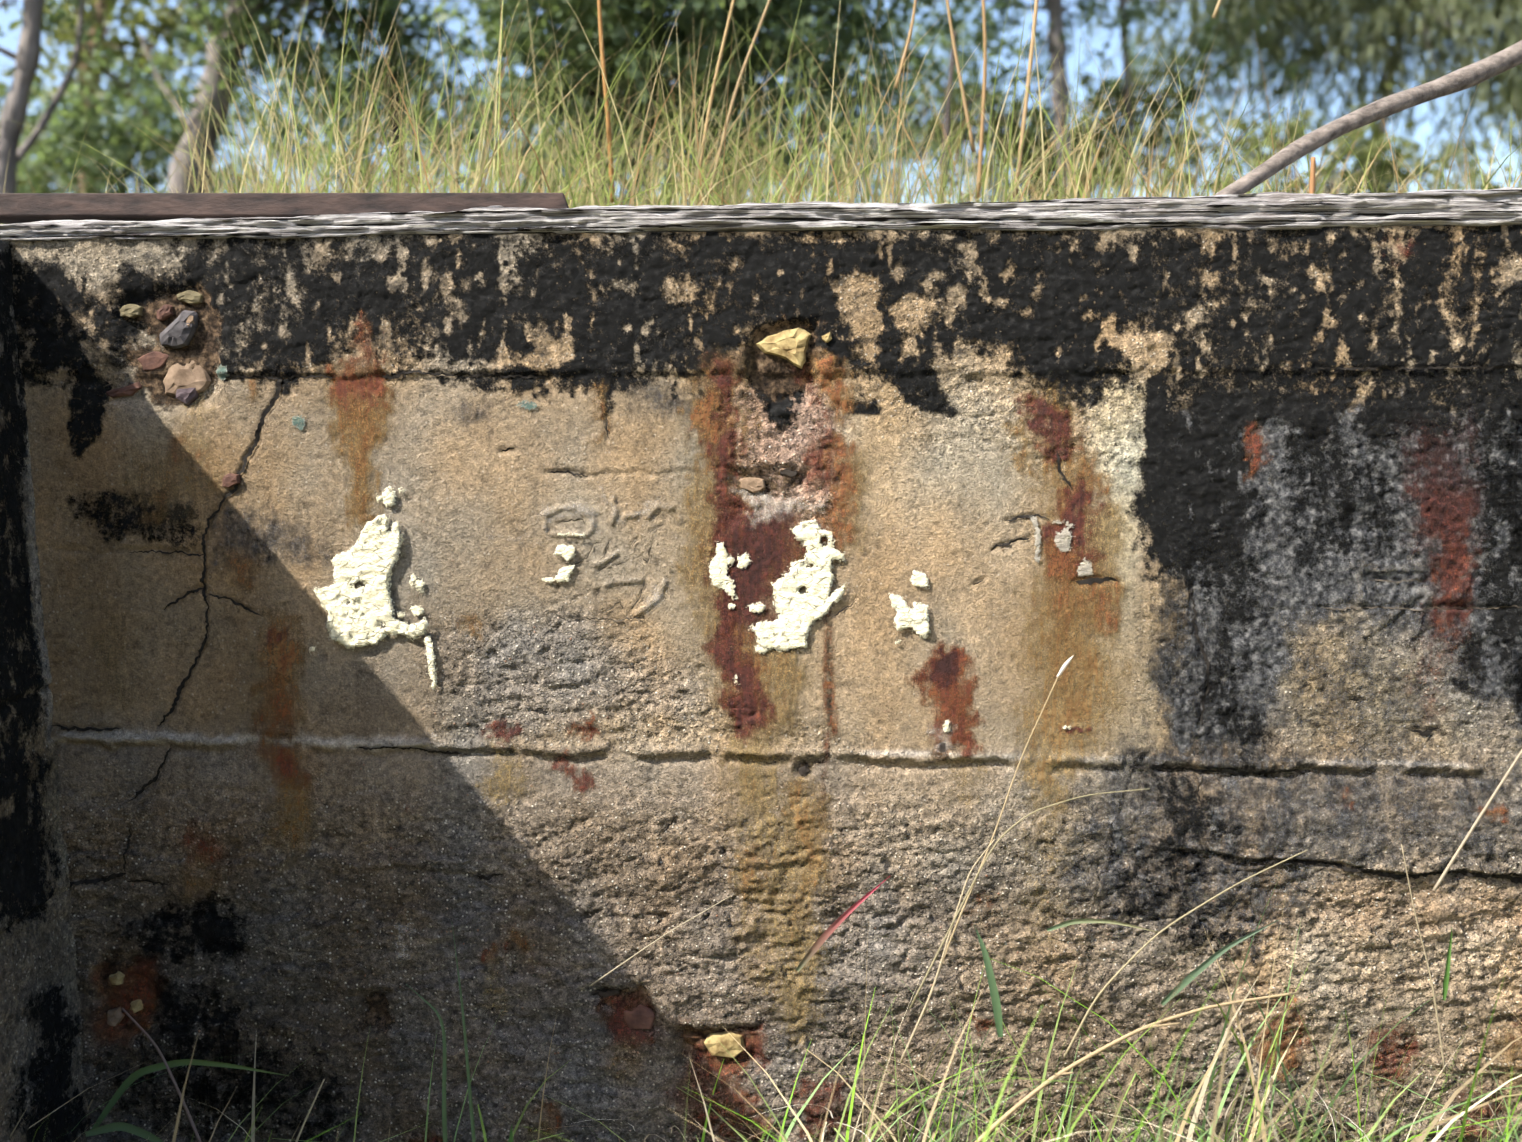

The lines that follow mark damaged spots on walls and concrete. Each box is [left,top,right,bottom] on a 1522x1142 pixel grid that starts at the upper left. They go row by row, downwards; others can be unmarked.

peeling [376,483,406,508]
crack [70,370,334,887]
peeling [397,574,425,619]
crack [356,746,467,756]
peeling [423,635,438,690]
peeling [708,541,766,614]
damp [0,225,1522,966]
corrosion [675,350,868,1047]
corrosion [911,644,987,804]
corrosion [1005,388,1131,940]
crack [1262,859,1522,884]
damp [7,979,91,1142]